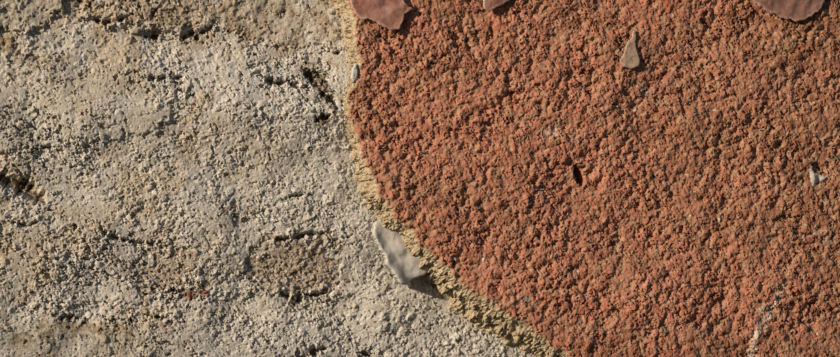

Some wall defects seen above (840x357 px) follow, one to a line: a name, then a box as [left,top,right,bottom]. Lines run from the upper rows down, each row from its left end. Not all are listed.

spalling [333,0,569,357]
spalling [120,245,198,302]
spalling [207,197,347,307]